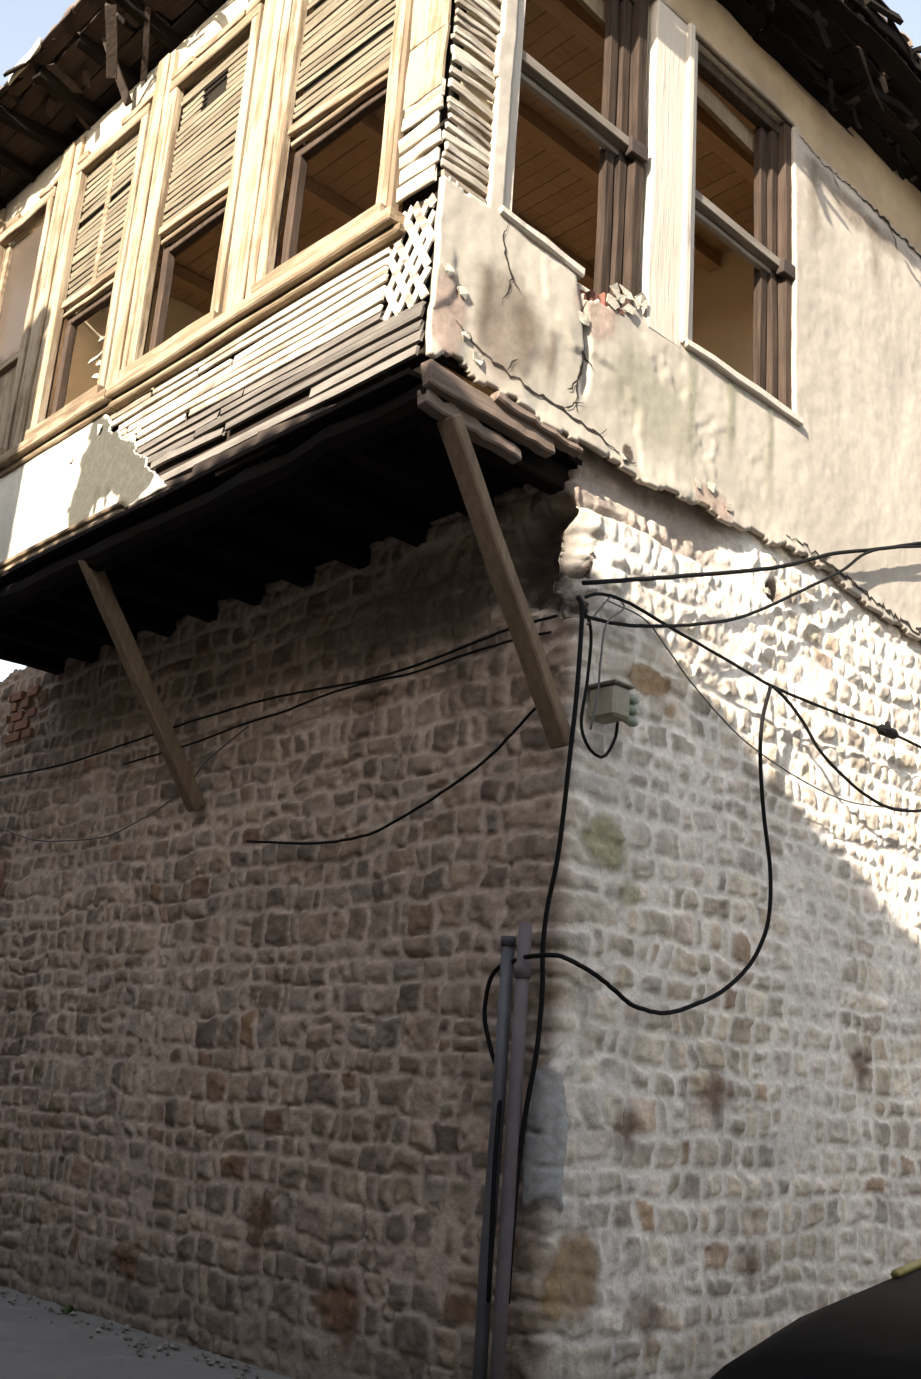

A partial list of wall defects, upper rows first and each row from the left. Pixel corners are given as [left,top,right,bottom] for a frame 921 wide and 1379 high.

peeling [431,262,483,366]
crack [502,220,521,305]
peeling [606,283,648,315]
crack [455,301,636,464]
peeling [67,416,154,528]
peeling [695,478,733,521]